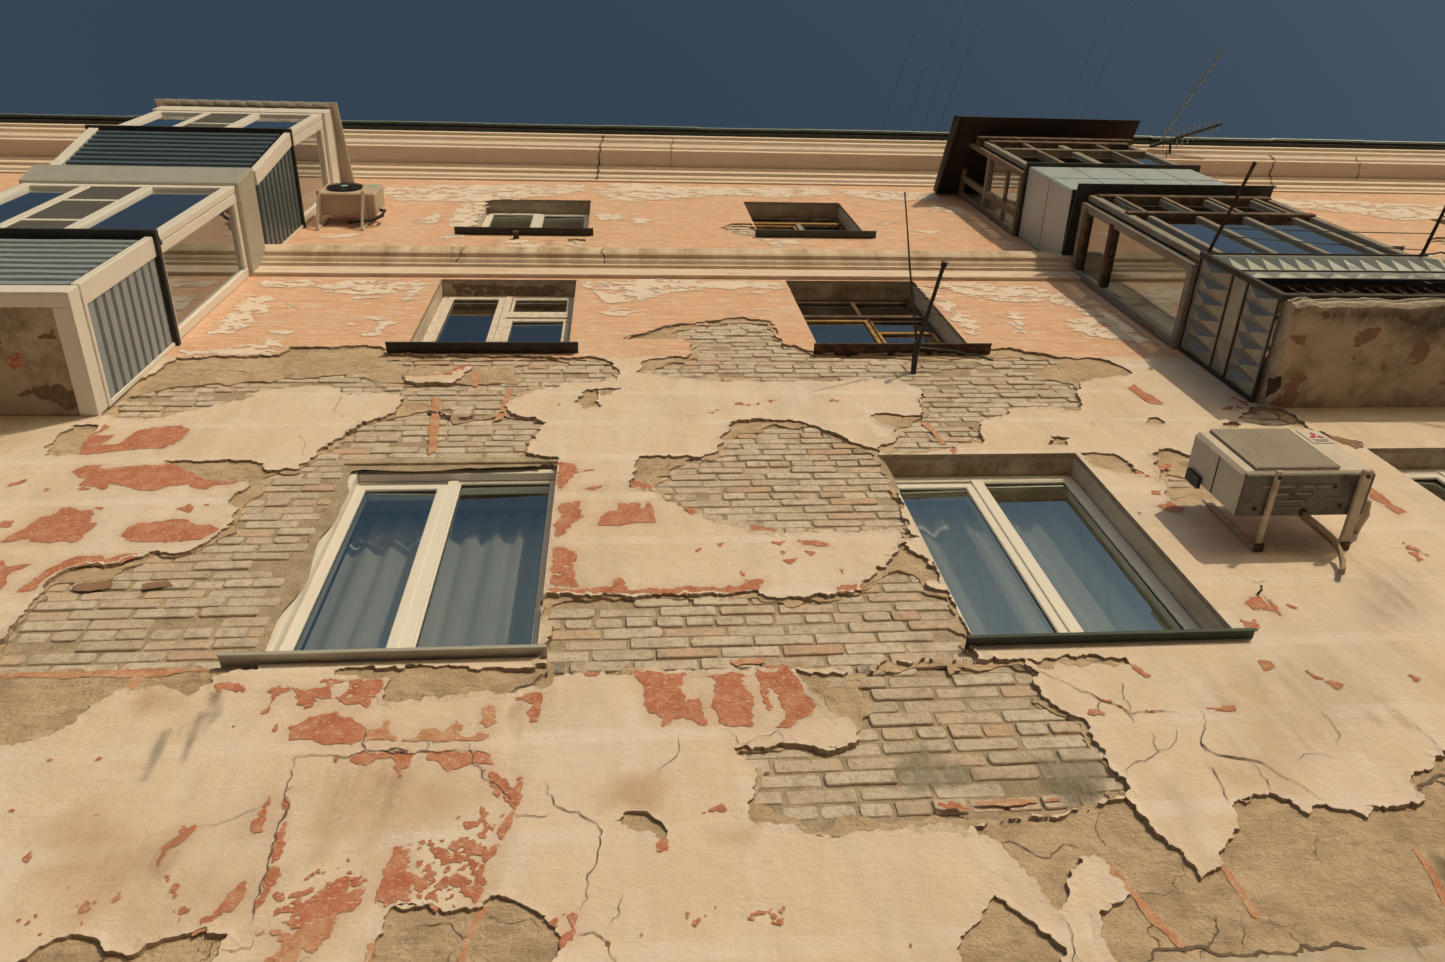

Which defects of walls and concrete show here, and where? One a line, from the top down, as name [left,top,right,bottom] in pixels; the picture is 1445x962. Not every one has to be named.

crack [595,135,604,180]
spalling [0,278,1445,962]
crack [1032,666,1341,801]
crack [1414,723,1445,792]
crack [199,729,623,962]